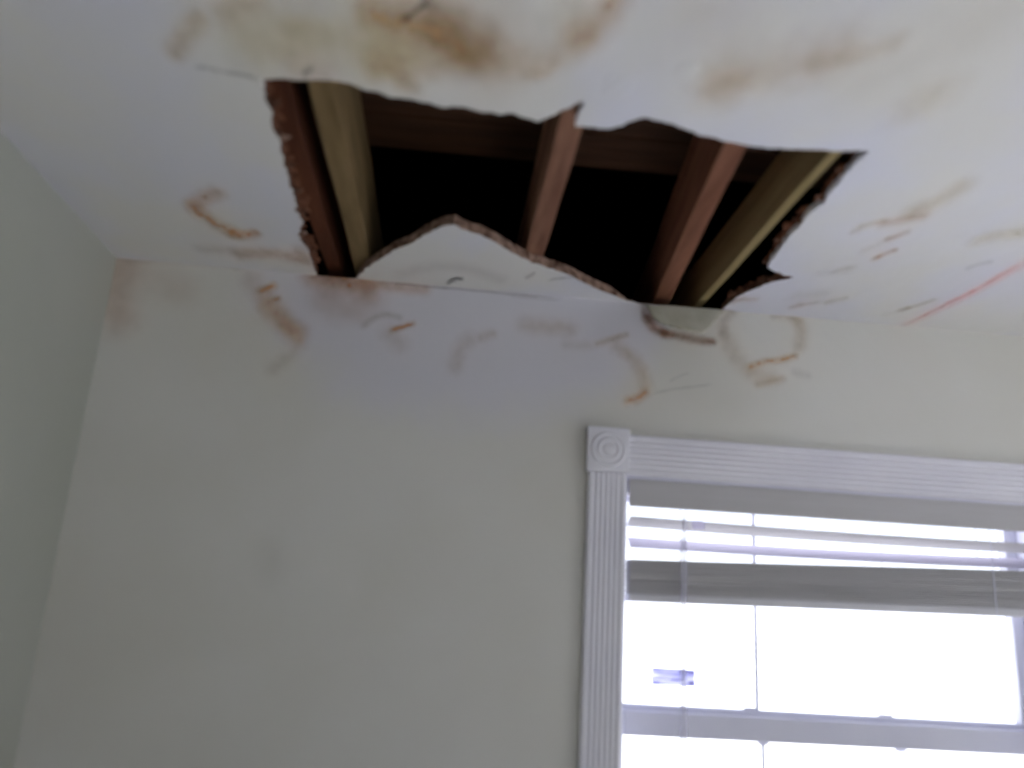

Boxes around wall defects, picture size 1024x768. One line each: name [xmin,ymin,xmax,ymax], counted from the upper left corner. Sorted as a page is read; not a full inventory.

spalling [300,209,329,276]
spalling [369,146,535,248]
spalling [543,165,678,300]
spalling [646,181,826,343]